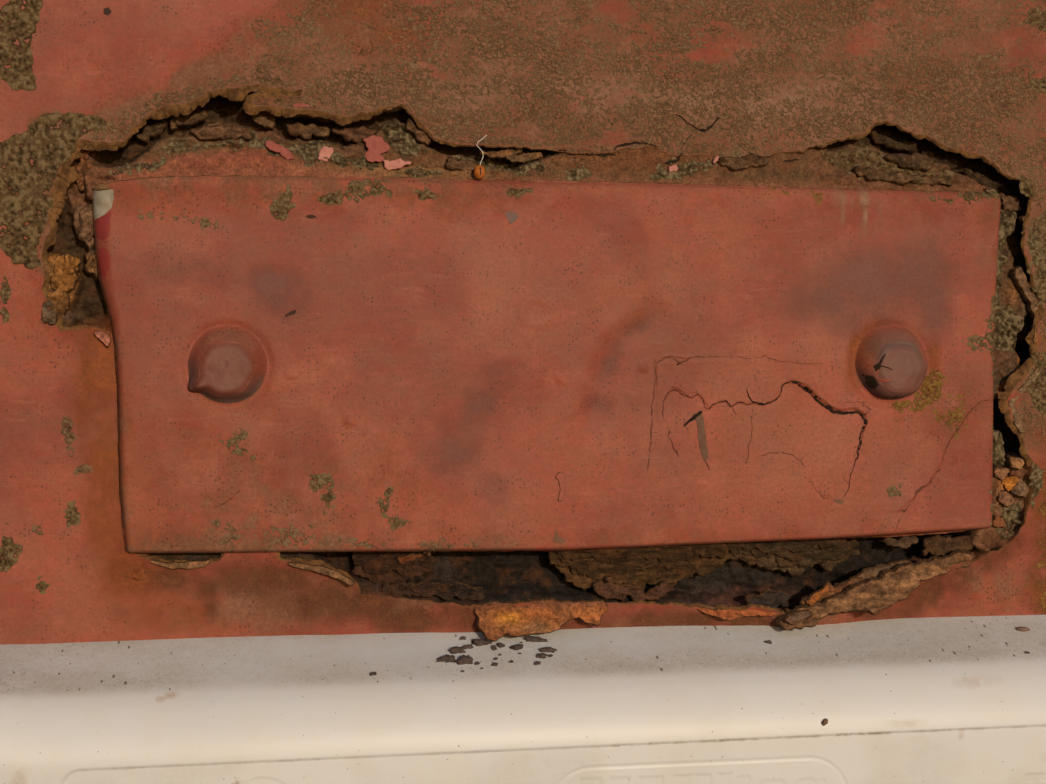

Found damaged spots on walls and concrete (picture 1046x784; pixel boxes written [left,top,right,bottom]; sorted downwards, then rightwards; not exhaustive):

spalling [41,122,989,347]
spalling [280,210,1046,642]
spalling [139,553,222,569]